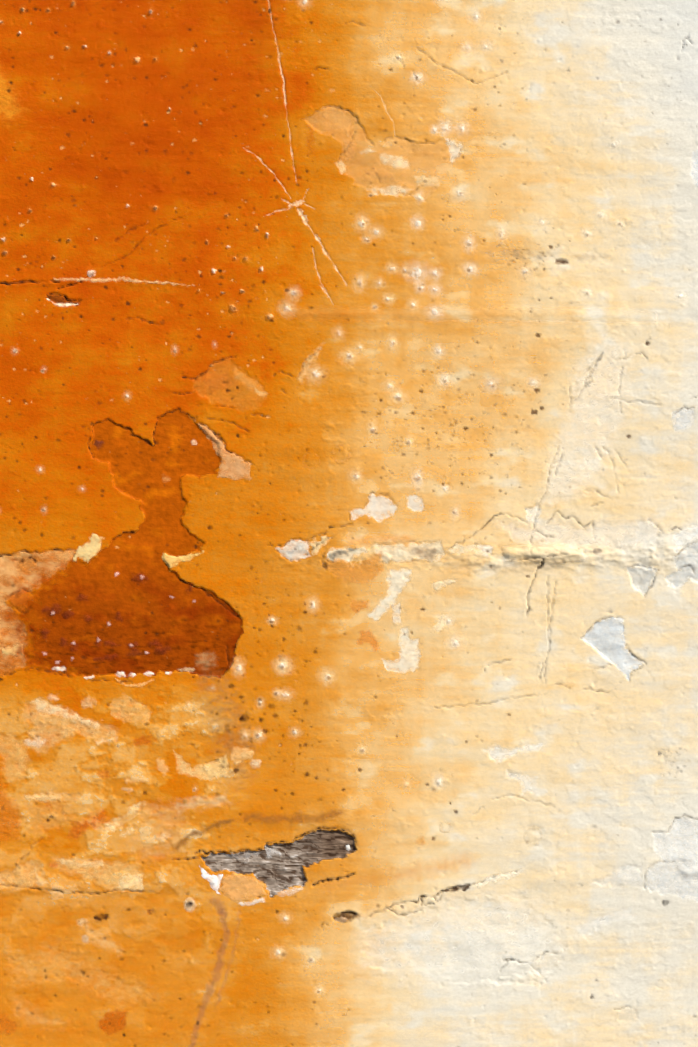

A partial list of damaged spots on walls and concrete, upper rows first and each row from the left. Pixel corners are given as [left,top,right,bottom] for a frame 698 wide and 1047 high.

peeling [0,409,249,686]
rust [0,0,547,1047]
peeling [358,497,396,518]
peeling [583,617,640,680]
spalling [201,830,357,905]